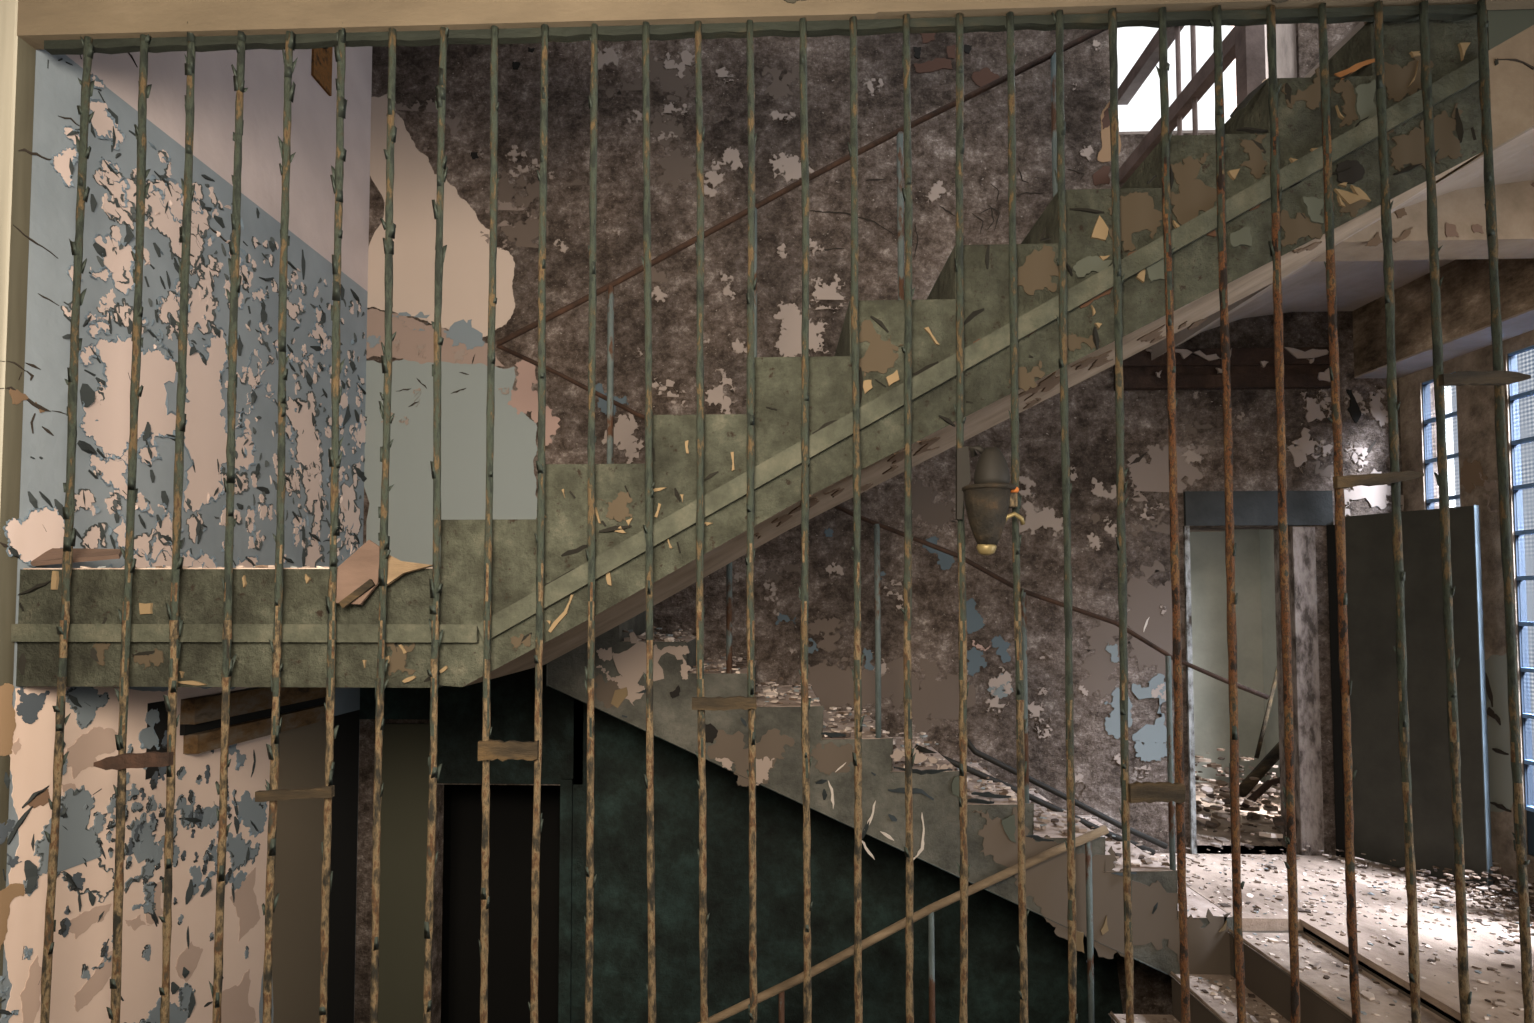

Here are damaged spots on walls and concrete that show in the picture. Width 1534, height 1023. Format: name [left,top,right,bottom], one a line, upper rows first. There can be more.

crack [1495,59,1534,70]
flaking render [704,146,743,198]
flaking render [768,152,814,183]
flaking render [3,55,560,611]
flaking render [773,273,847,357]
flaking render [705,368,736,414]
flaking render [602,409,655,464]
flaking render [1019,476,1063,537]
flaking render [1070,467,1117,551]
spalling [594,632,692,709]
peeling [705,717,795,787]
flaking render [0,648,271,1023]